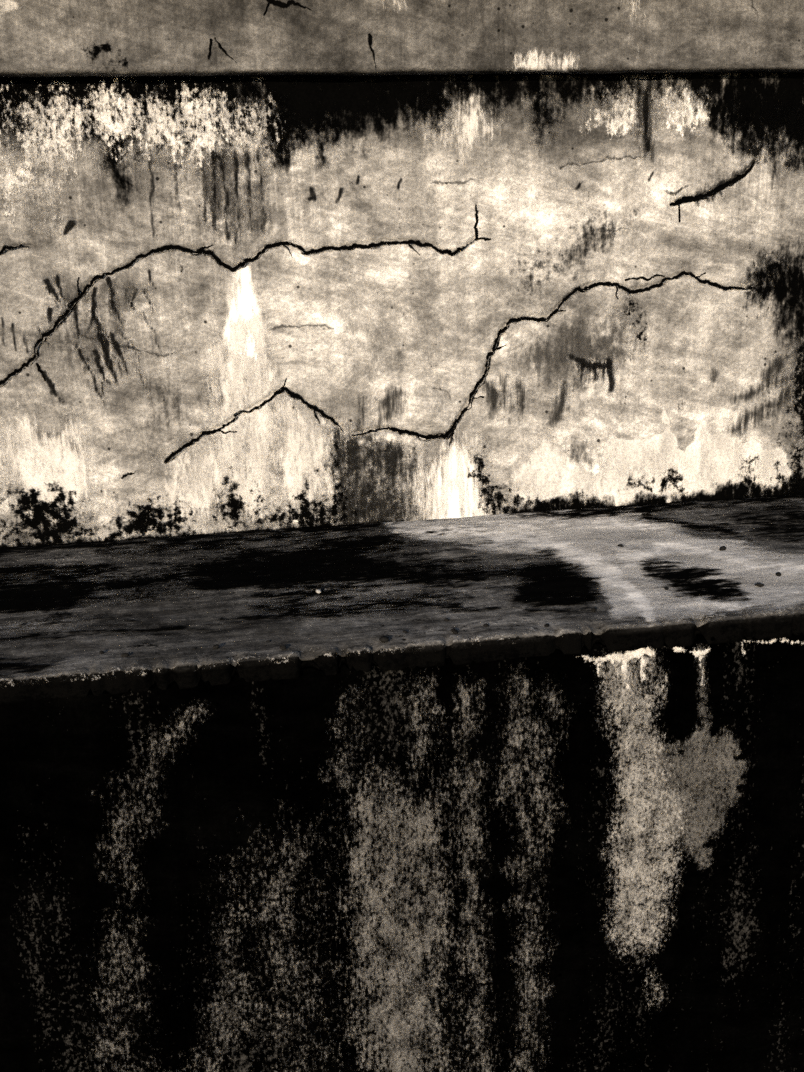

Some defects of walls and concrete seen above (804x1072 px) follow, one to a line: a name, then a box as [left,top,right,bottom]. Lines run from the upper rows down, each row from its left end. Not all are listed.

damp [0,43,804,243]
crack [0,178,491,386]
damp [0,240,804,641]
crack [164,271,755,464]
efflorescence [95,932,152,1070]
damp [110,706,201,899]
efflorescence [196,931,263,1071]
efflorescence [231,839,306,931]
efflorescence [325,680,492,1072]
efflorescence [497,672,563,880]
efflorescence [512,896,549,1072]
efflorescence [583,647,746,963]